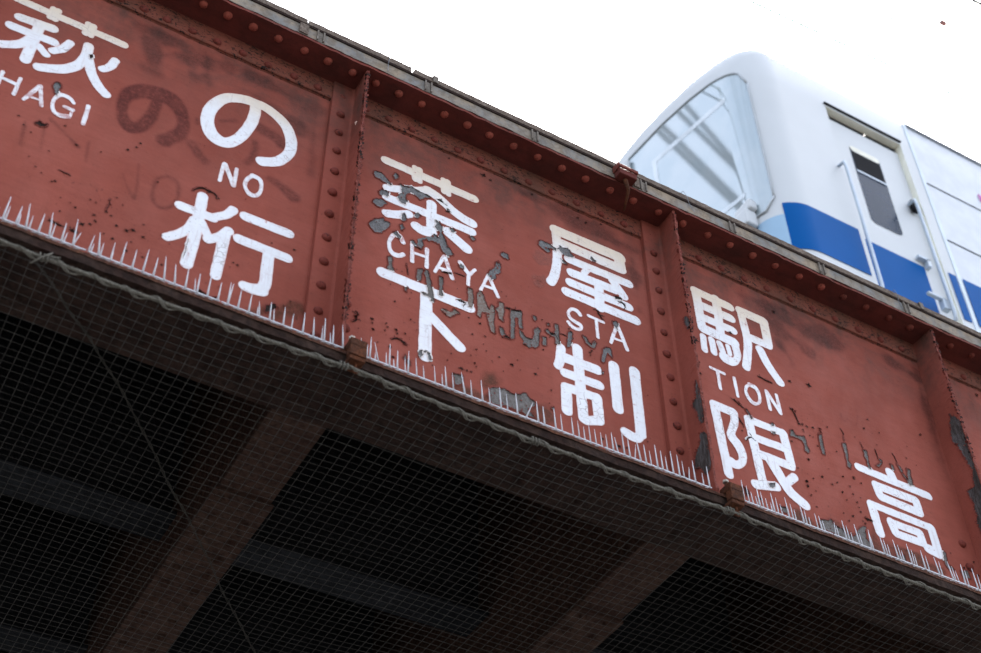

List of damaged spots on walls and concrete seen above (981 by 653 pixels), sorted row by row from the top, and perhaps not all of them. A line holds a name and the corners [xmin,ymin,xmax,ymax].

peeling [487,251,510,281]
peeling [404,267,613,386]
peeling [487,386,536,418]
peeling [691,361,711,475]
peeling [789,418,917,551]
peeling [930,330,981,533]